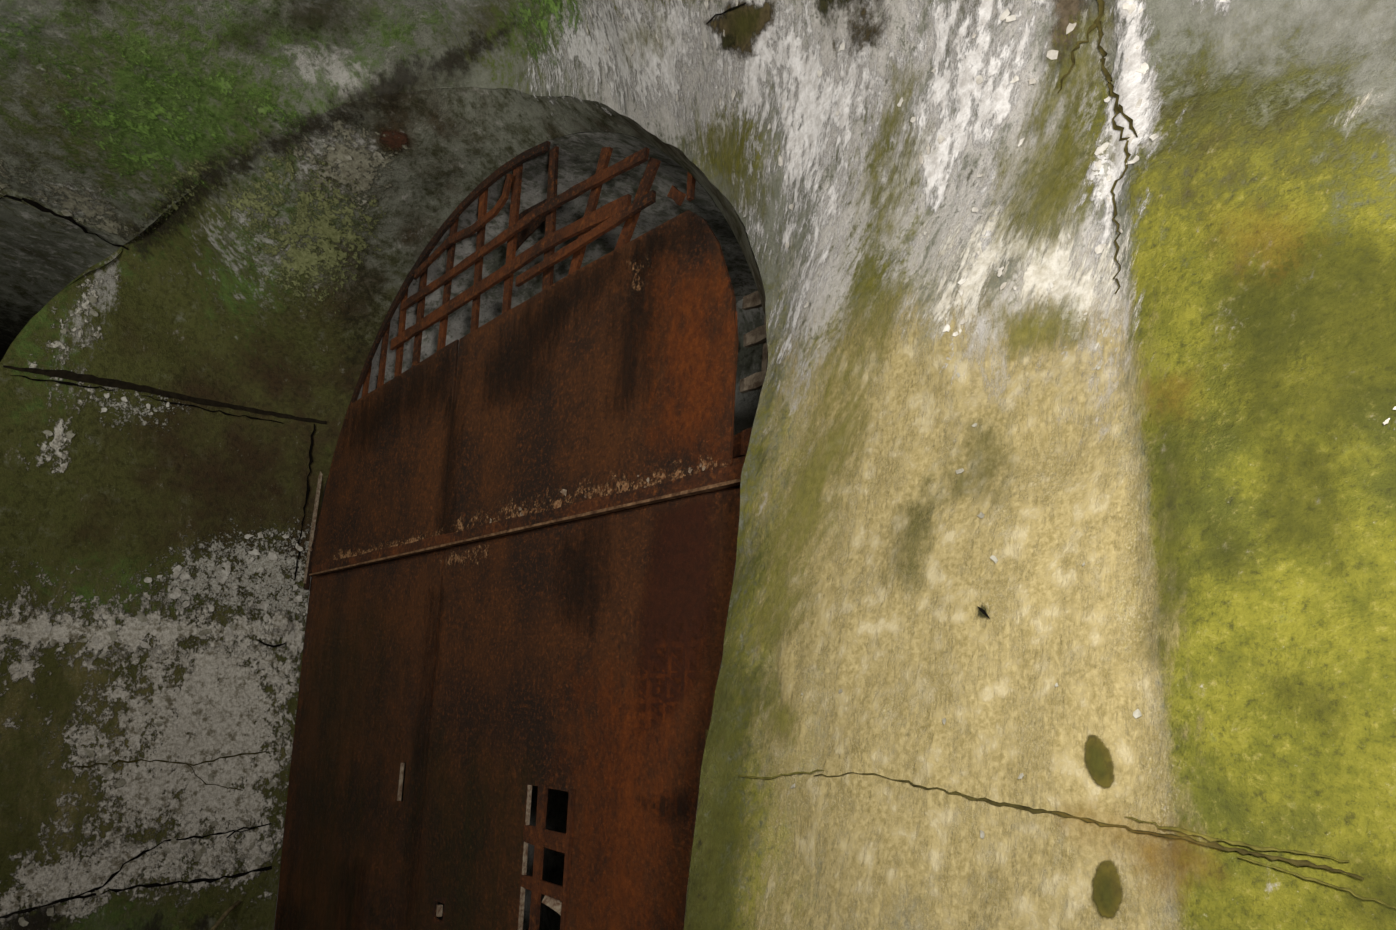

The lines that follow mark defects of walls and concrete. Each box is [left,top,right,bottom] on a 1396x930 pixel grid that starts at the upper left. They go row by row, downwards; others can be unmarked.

damp [814,0,885,50]
damp [1031,0,1107,128]
crack [1057,0,1138,294]
crack [0,195,129,250]
damp [1009,309,1072,349]
crack [3,365,327,580]
peeling [517,0,1178,930]
peeling [0,516,316,930]
crack [68,751,279,791]
damp [4,902,63,930]
crack [0,823,272,918]
crack [739,769,1396,908]